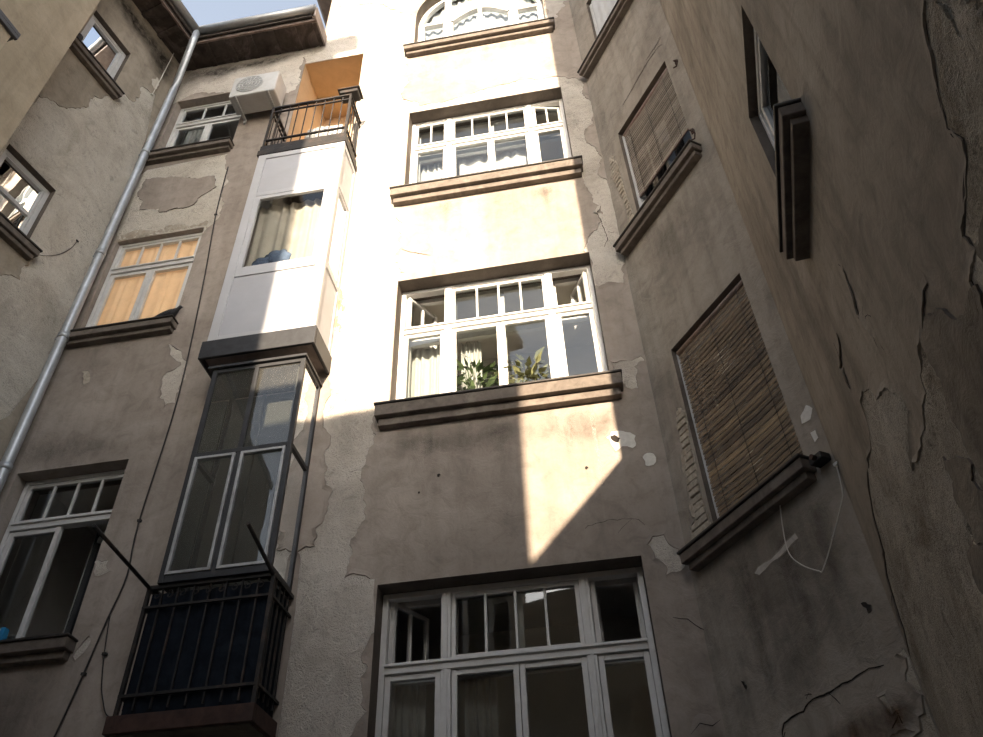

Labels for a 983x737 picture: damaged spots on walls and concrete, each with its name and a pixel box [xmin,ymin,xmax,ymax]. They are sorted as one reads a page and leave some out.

peeling [0,75,232,420]
peeling [920,0,983,478]
peeling [173,3,634,737]
peeling [608,352,647,393]
peeling [604,428,659,469]
flaking render [643,405,711,578]
peeling [93,558,113,579]
crack [865,468,910,656]
peeling [71,634,94,663]
crack [766,657,884,737]
peeling [860,649,938,737]